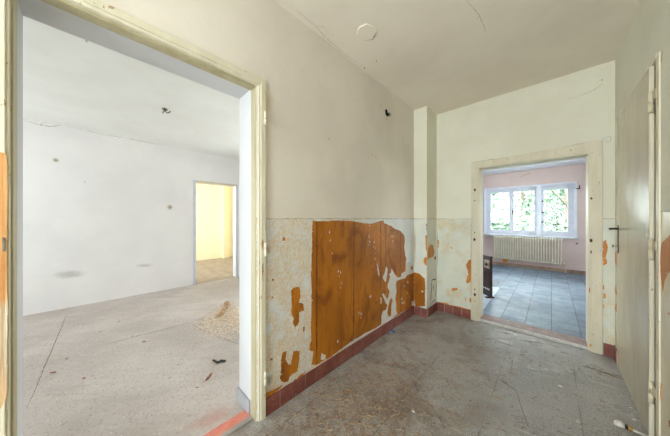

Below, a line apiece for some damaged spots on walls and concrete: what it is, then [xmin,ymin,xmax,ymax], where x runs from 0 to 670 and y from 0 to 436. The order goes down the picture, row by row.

peeling [423,224,439,266]
peeling [602,240,617,266]
peeling [660,235,670,291]
peeling [291,220,426,365]
peeling [266,351,306,398]